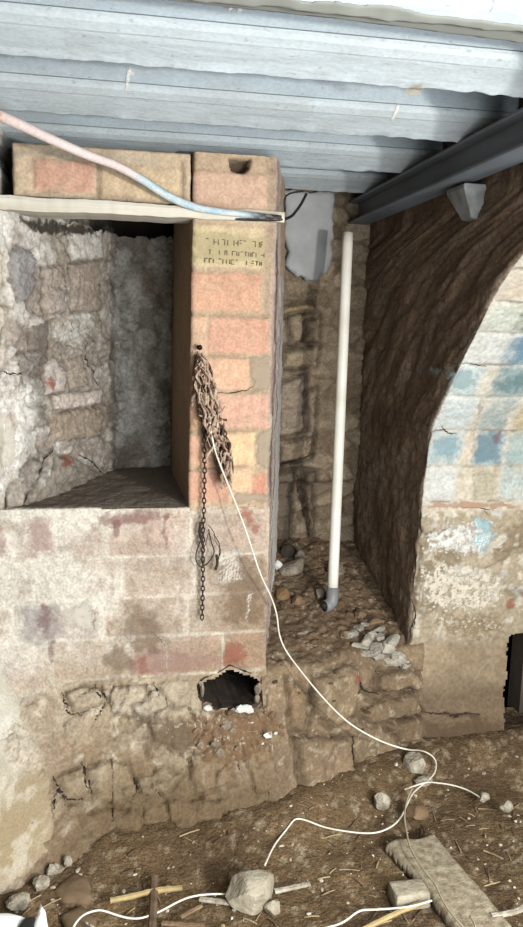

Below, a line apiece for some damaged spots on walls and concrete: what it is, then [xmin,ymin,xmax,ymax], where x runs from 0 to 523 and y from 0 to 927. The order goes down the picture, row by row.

leakage [429,501,513,509]
crack [61,684,108,720]
spalling [188,665,285,769]
crack [421,710,480,718]
crack [52,765,92,809]